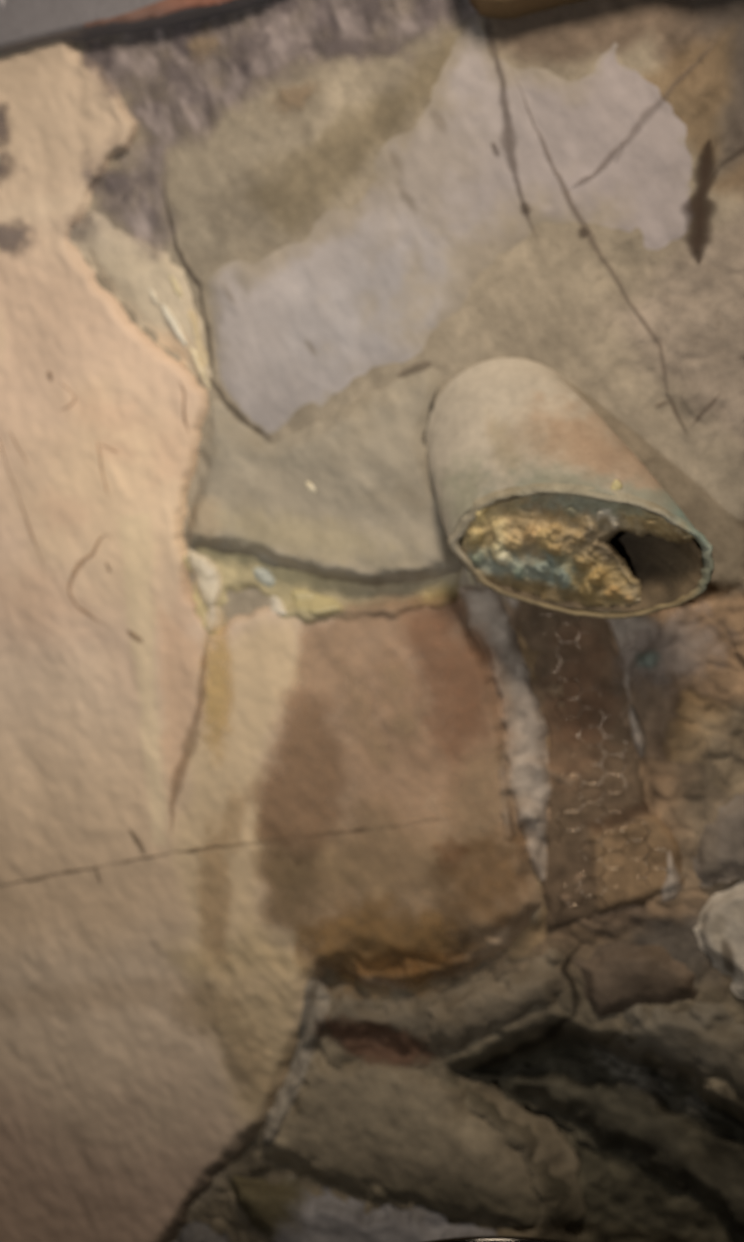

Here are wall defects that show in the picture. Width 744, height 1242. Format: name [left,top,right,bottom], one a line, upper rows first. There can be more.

spalling [686,139,713,264]
flaking render [69,211,213,389]
leakage [260,602,506,976]